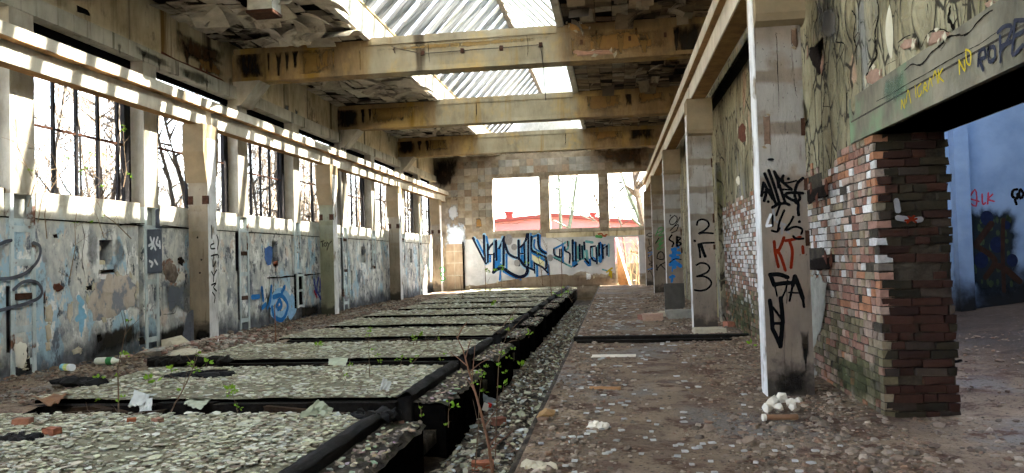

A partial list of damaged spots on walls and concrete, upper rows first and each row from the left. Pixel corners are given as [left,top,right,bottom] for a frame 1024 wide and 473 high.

spalling [573,47,617,58]
spalling [900,28,950,51]
spalling [864,64,883,87]
crack [775,1,997,151]
spalling [162,257,185,286]
spalling [67,268,139,323]
leakage [777,348,808,394]